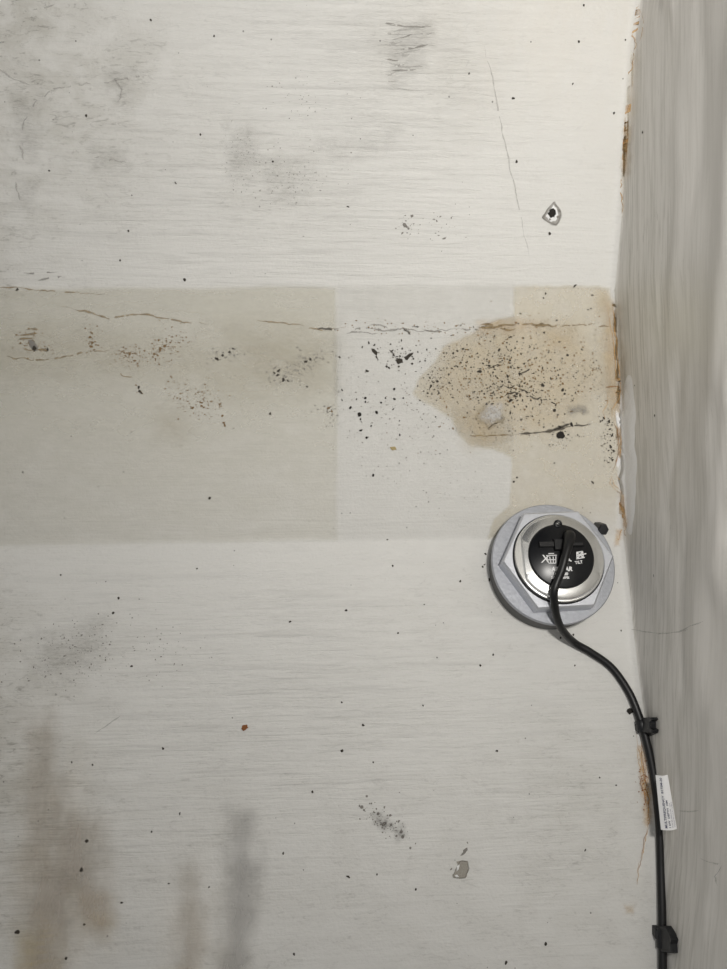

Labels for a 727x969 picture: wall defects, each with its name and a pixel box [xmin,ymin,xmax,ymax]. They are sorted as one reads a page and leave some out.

crack [0,287,201,323]
crack [258,318,601,339]
water stain [259,313,608,471]
corrosion [636,735,650,880]